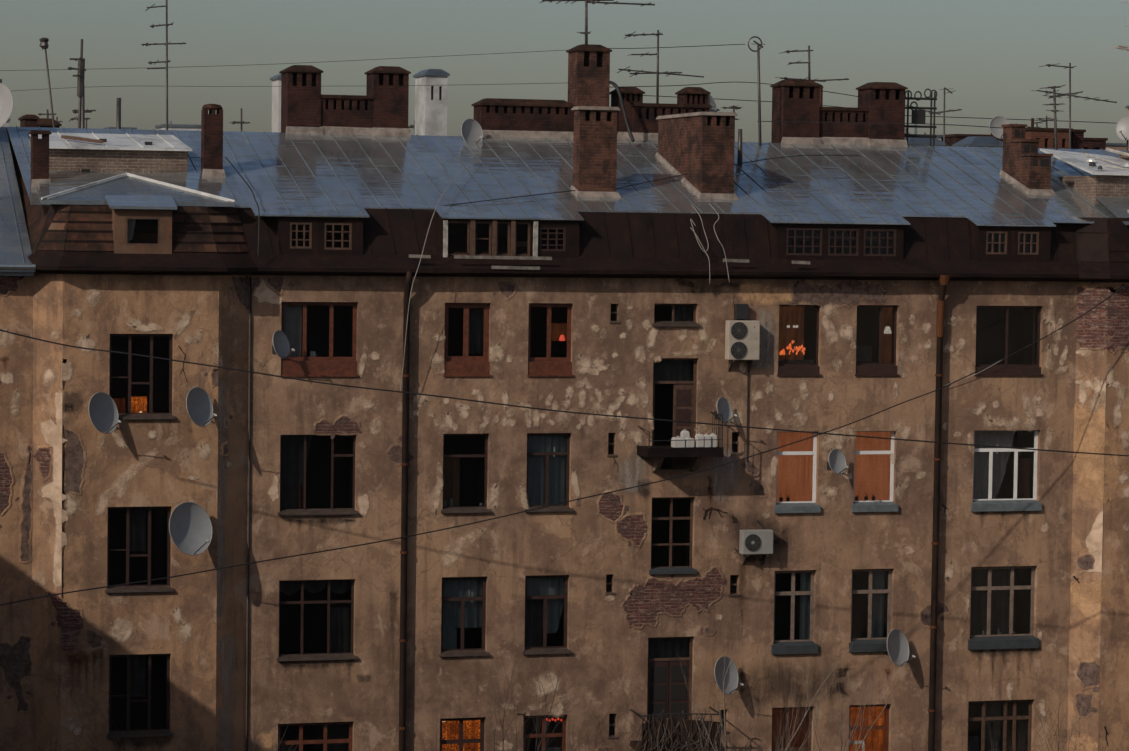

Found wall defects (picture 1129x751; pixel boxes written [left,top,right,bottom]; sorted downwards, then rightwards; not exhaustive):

peeling [359,352,379,377]
flaking render [1043,282,1129,448]
flaking render [313,402,381,448]
spalling [0,428,134,658]
peeling [434,462,443,515]
peeling [488,484,499,510]
peeling [520,485,529,513]
peeling [571,469,580,506]
flaking render [596,490,649,548]
flaking render [605,565,729,637]
peeling [528,672,573,716]
spalling [1073,659,1100,719]